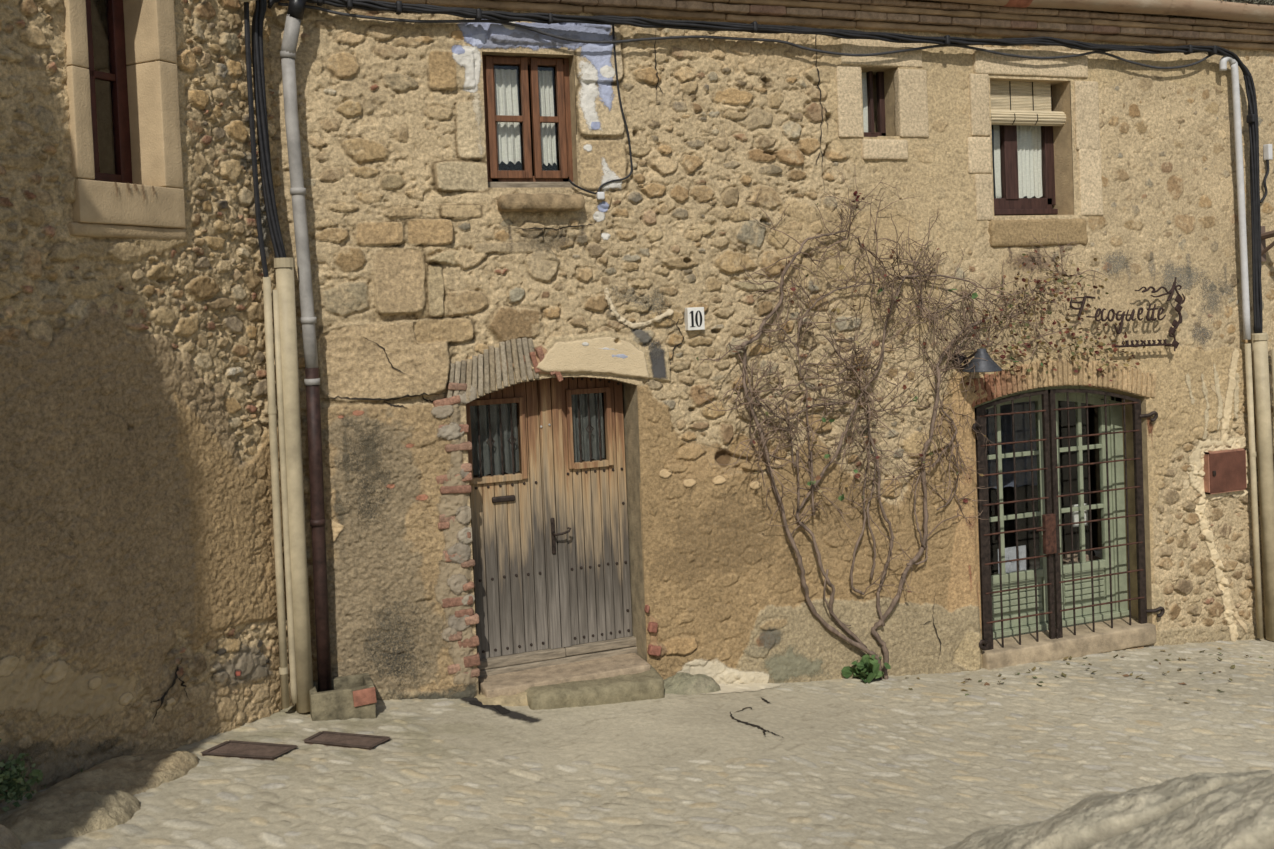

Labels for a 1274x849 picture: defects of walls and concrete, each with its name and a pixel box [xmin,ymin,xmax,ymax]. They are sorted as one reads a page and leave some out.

peeling [451,19,615,155]
peeling [583,144,622,240]
crack [327,337,446,408]
water stain [336,418,391,525]
crack [152,659,188,720]